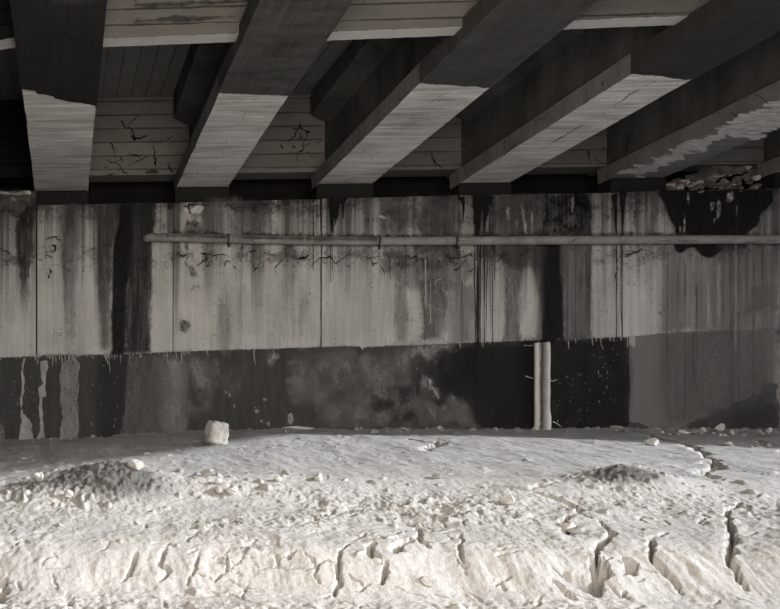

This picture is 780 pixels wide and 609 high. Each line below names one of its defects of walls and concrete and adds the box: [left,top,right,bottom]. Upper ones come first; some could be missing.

peeling [617,101,780,178]
damp [96,202,156,437]
crack [178,239,535,339]
damp [381,192,649,429]
damp [652,189,780,429]